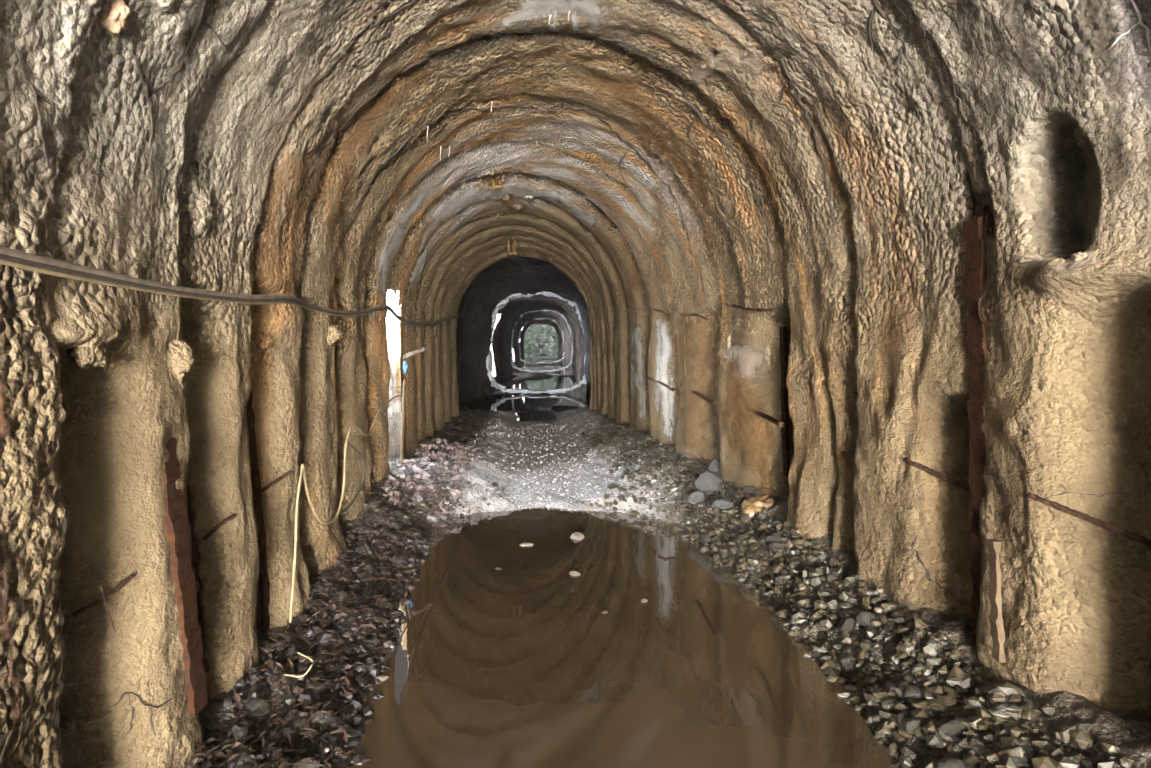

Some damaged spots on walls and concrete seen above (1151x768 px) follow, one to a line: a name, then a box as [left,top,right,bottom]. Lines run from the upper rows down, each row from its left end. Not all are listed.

corrosion [187,474,209,672]